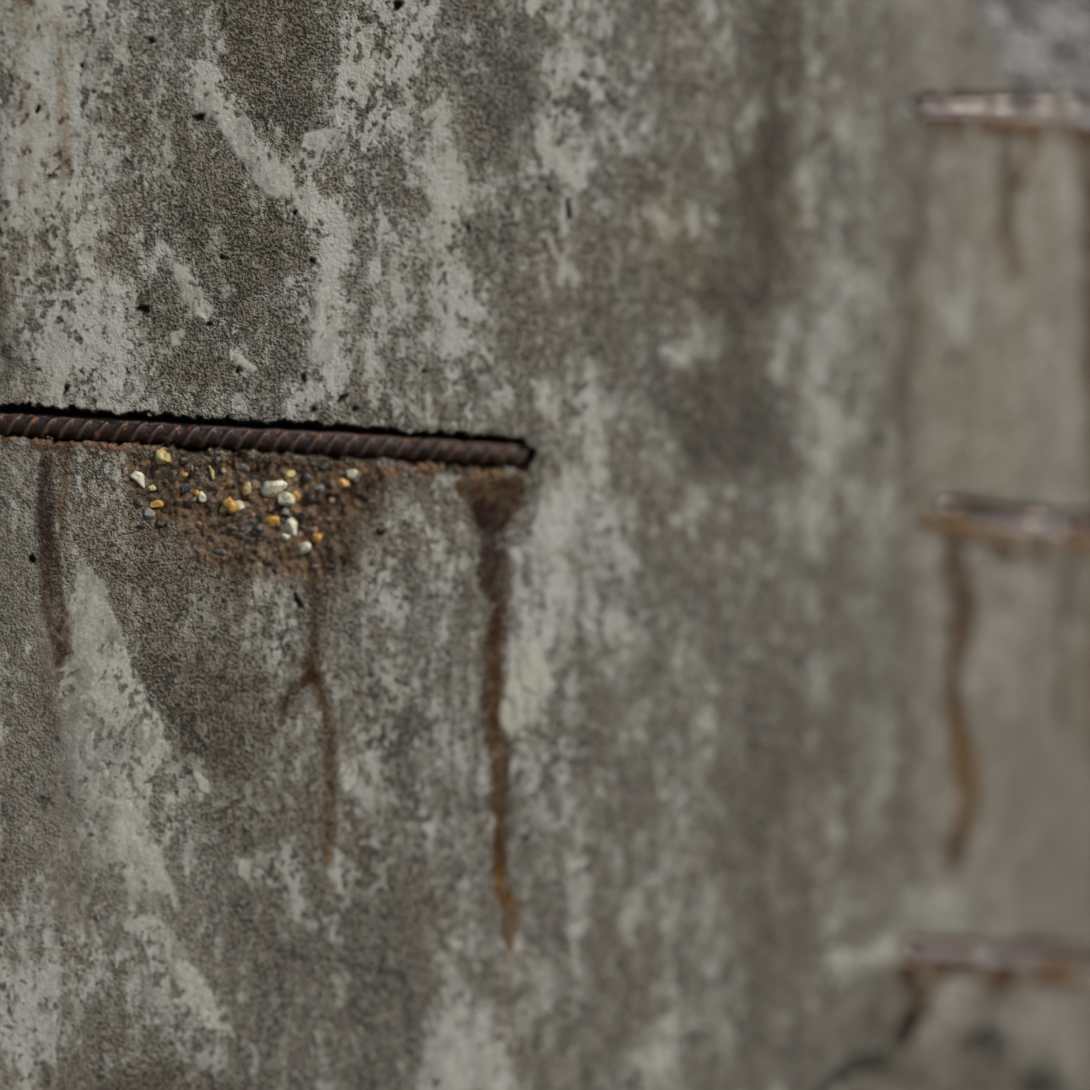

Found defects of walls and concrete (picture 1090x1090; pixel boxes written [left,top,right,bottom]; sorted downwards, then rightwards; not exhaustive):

spalling [910,0,1090,141]
spalling [0,403,537,580]
corrosion [456,478,523,778]
corrosion [491,791,515,948]